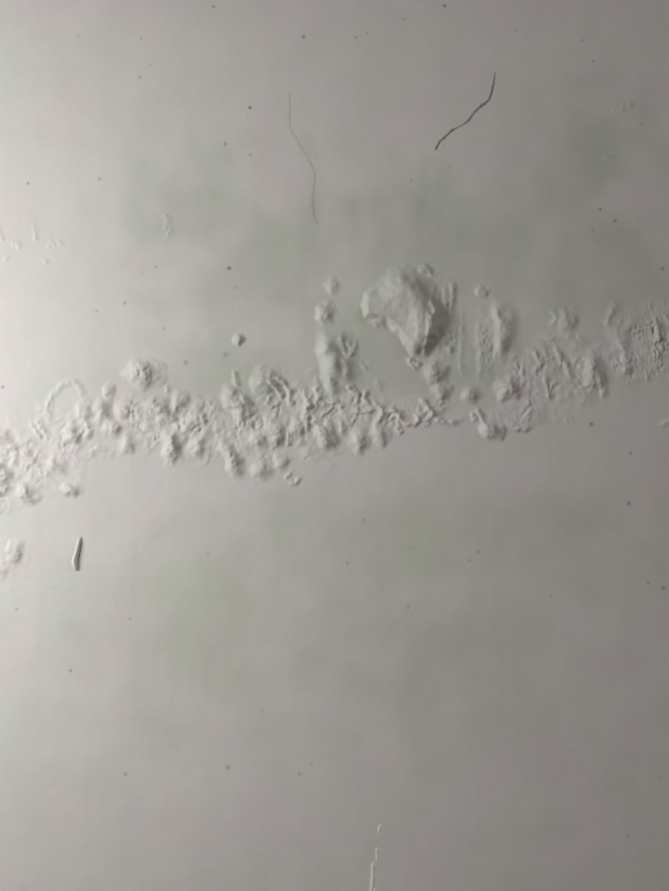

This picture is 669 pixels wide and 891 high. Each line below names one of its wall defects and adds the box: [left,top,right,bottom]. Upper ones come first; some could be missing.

crack [435,72,496,151]